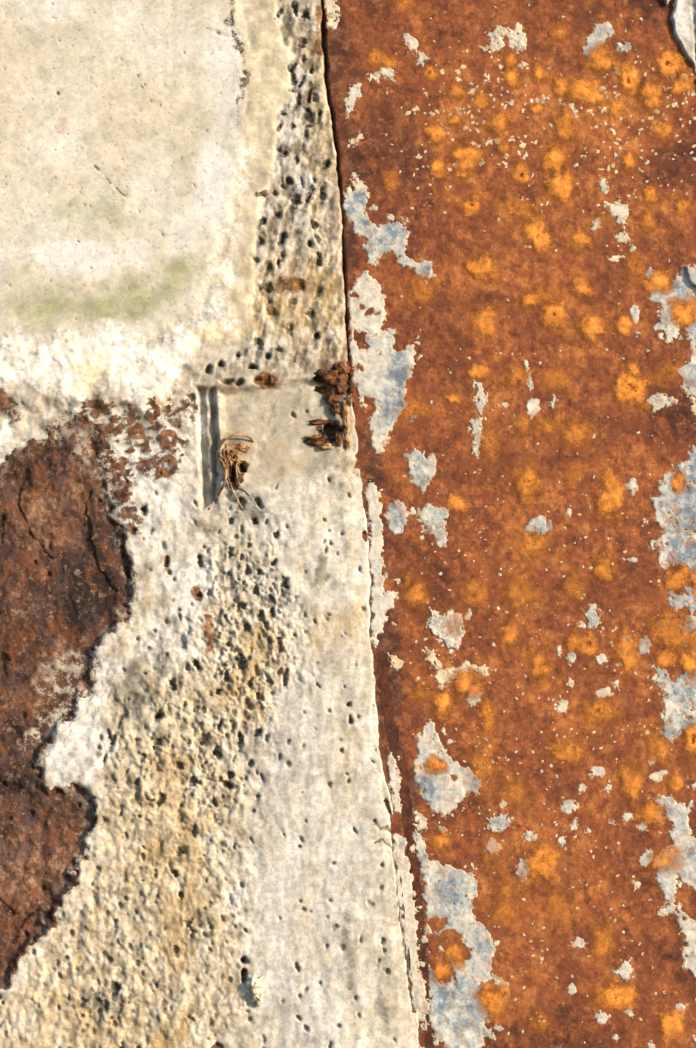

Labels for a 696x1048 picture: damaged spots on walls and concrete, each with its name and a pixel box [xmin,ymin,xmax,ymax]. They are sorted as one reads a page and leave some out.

damp [276,37,323,137]
rust [502,42,696,203]
rust [1,392,198,534]
damp [0,146,330,555]
peeling [341,172,437,455]
rust [521,274,635,346]
rust [613,362,651,410]
damp [216,654,288,712]
damp [237,566,290,657]
peeling [363,448,449,671]
peeling [386,719,514,1048]
peeling [639,782,696,978]